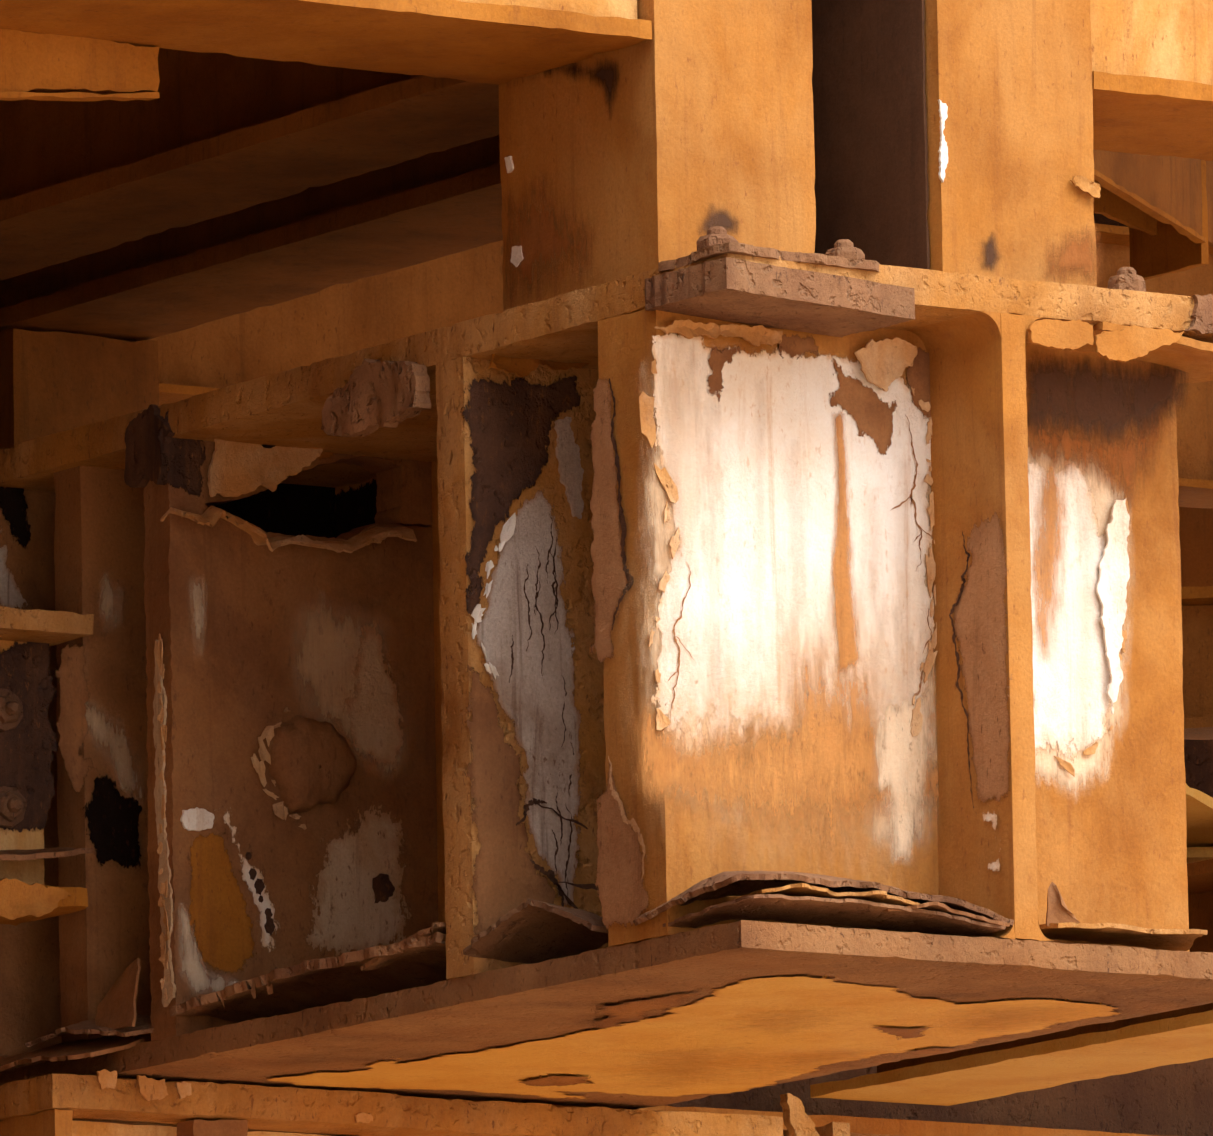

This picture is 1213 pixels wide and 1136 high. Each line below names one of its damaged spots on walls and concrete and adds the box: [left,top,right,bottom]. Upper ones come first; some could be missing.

peeling [510,246,524,267]
peeling [0,487,31,609]
peeling [156,411,417,553]
peeling [638,242,1012,830]
crack [891,415,934,569]
peeling [460,374,1014,964]
peeling [1027,450,1130,789]
peeling [0,619,449,1023]
crack [515,798,588,829]
crack [530,859,599,909]
peeling [96,1069,117,1089]
peeling [136,1075,192,1101]